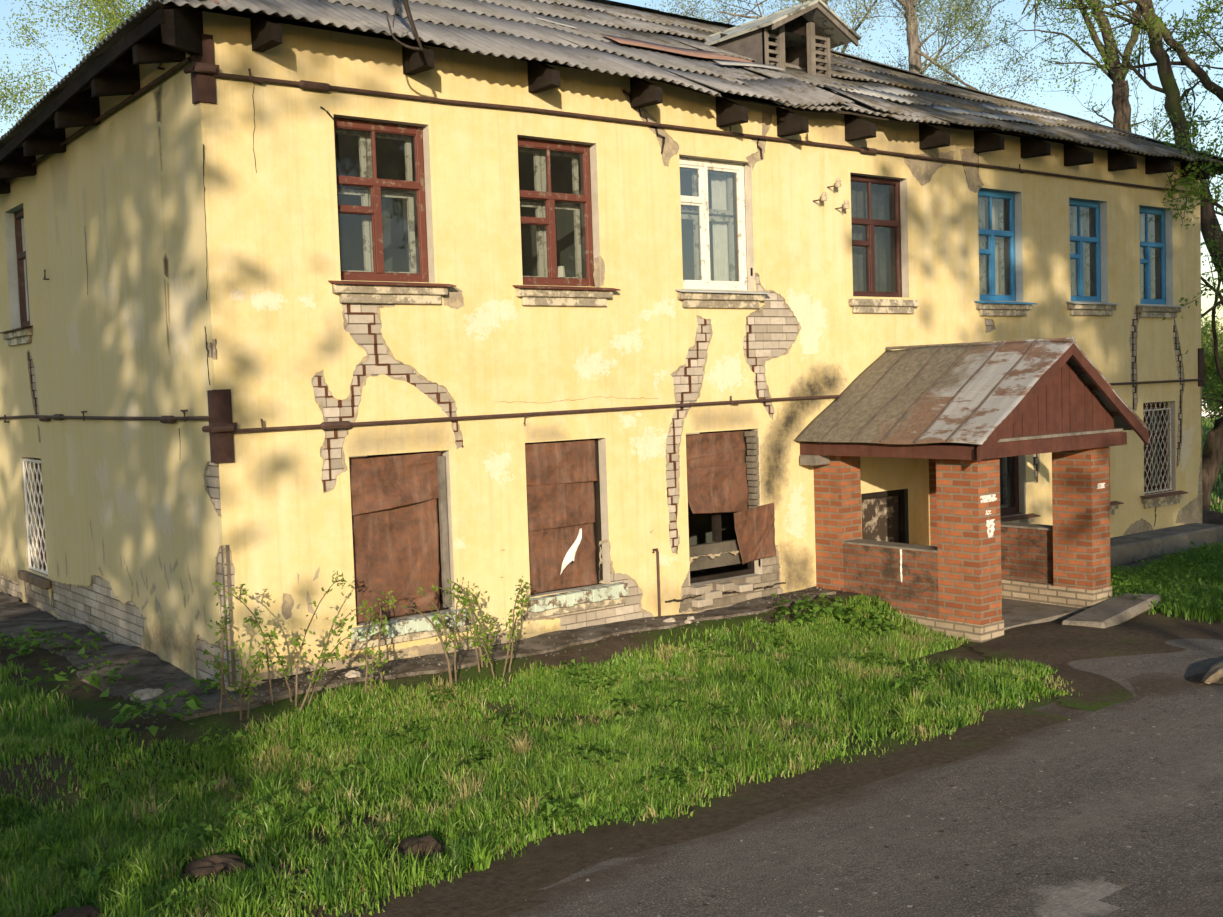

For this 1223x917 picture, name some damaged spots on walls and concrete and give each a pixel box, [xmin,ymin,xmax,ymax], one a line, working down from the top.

spalling [620,88,679,167]
spalling [903,148,983,193]
spalling [27,350,41,442]
peeling [116,391,145,454]
spalling [311,303,464,494]
peeling [479,447,518,489]
peeling [569,269,831,614]
peeling [0,450,512,688]
spalling [521,539,653,630]